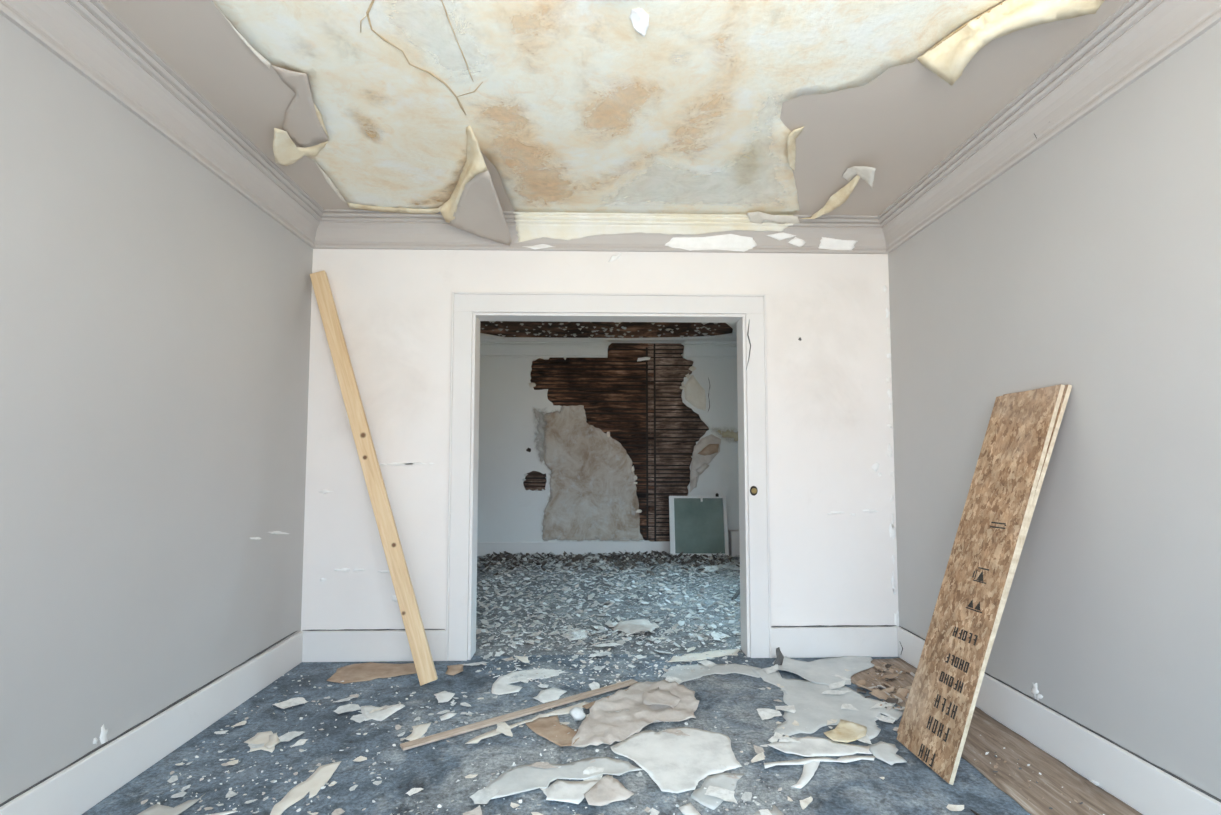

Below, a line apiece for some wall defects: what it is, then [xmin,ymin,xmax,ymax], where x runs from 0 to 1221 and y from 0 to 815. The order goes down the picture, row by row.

crack [360,0,483,115]
peeling [213,0,1105,252]
flaking render [480,321,733,542]